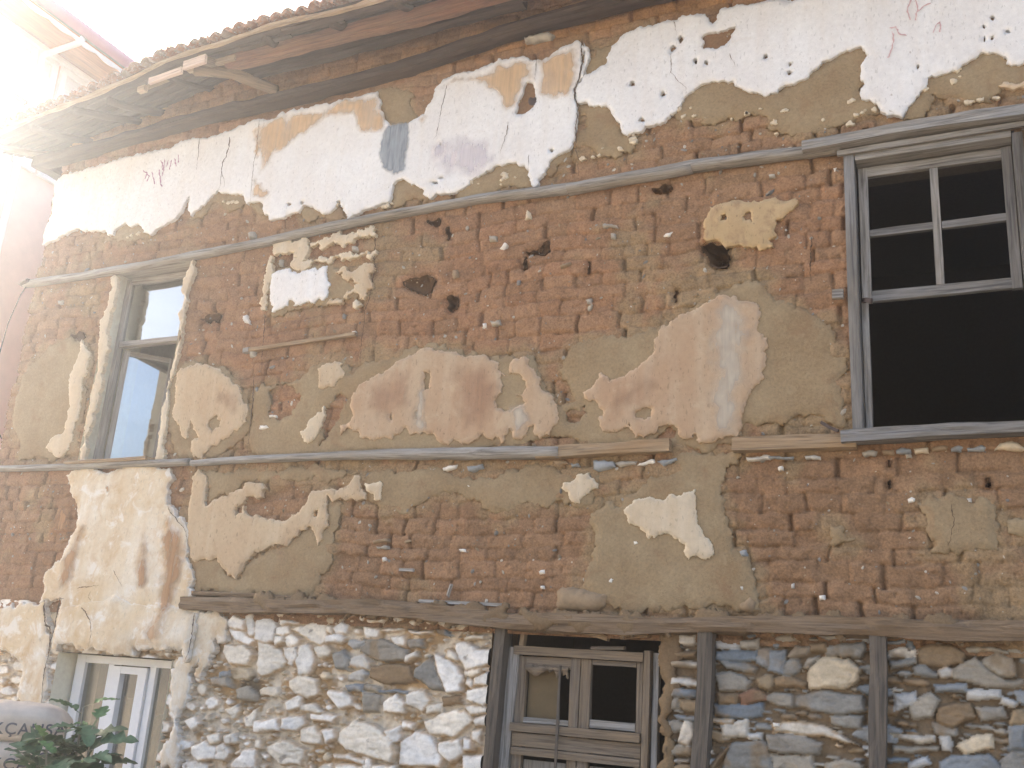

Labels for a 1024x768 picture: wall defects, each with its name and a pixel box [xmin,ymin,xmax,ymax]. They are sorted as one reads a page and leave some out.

crack [196,137,230,185]
peeling [42,0,1024,318]
crack [574,44,583,176]
spalling [0,260,848,768]
spalling [919,478,1024,556]